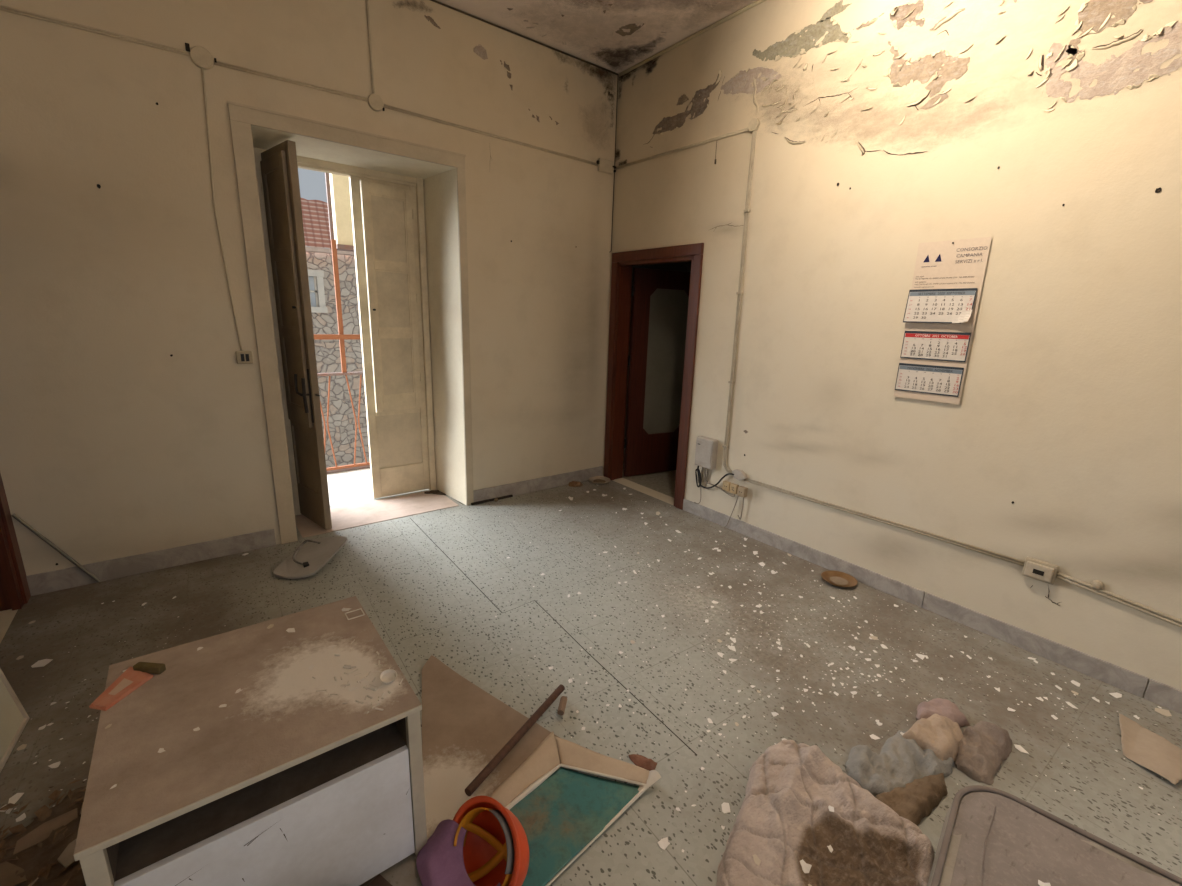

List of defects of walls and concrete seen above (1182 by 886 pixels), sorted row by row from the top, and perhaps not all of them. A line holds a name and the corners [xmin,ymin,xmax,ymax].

damp [579,25,666,99]
peeling [652,0,947,135]
peeling [888,41,970,109]
peeling [1038,0,1182,103]